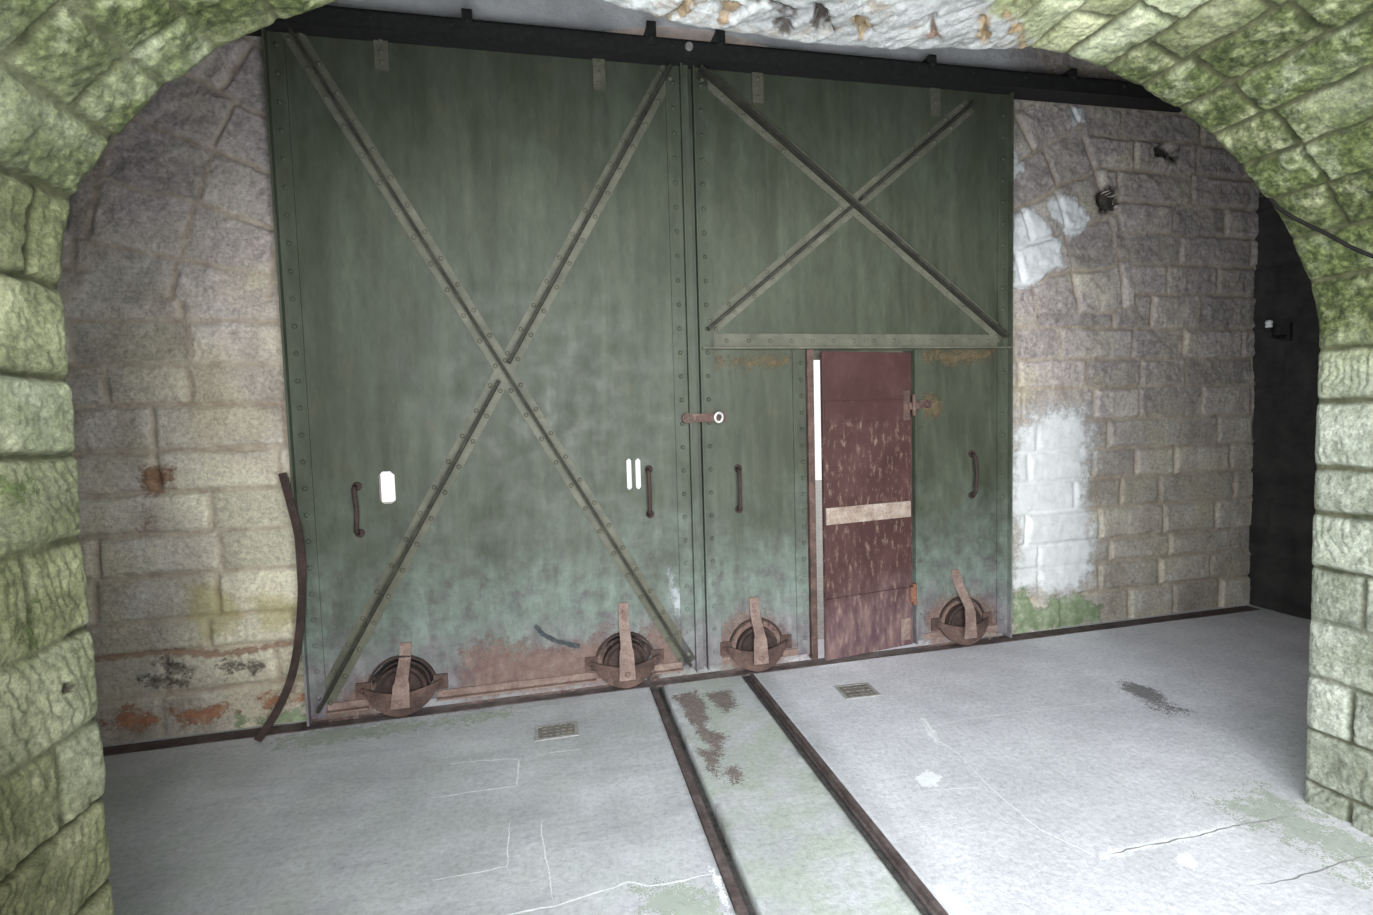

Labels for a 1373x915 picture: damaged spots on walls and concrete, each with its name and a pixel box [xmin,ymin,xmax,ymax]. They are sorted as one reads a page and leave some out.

flaking render [657,0,699,23]
flaking render [717,0,796,35]
flaking render [810,1,842,30]
flaking render [850,15,873,39]
peeling [1014,149,1025,179]
peeling [1013,185,1119,289]
rust [141,465,177,495]
leakage [1012,587,1104,634]
rust [94,642,291,662]
rust [100,701,241,733]
rust [639,624,747,785]
crack [922,698,1299,857]